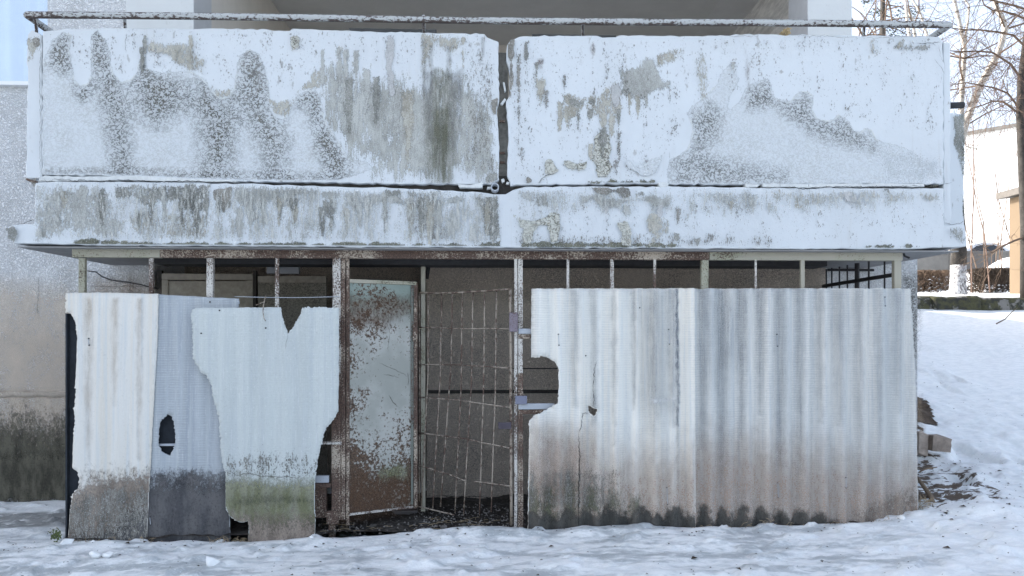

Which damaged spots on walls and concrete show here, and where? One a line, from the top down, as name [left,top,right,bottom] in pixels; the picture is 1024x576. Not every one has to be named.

water stain [53,38,68,68]
water stain [95,34,127,173]
water stain [126,34,182,119]
water stain [135,33,470,245]
water stain [516,40,649,137]
water stain [476,195,500,242]
water stain [657,205,689,241]
water stain [0,293,316,542]
crack [578,368,595,526]
water stain [528,504,832,530]